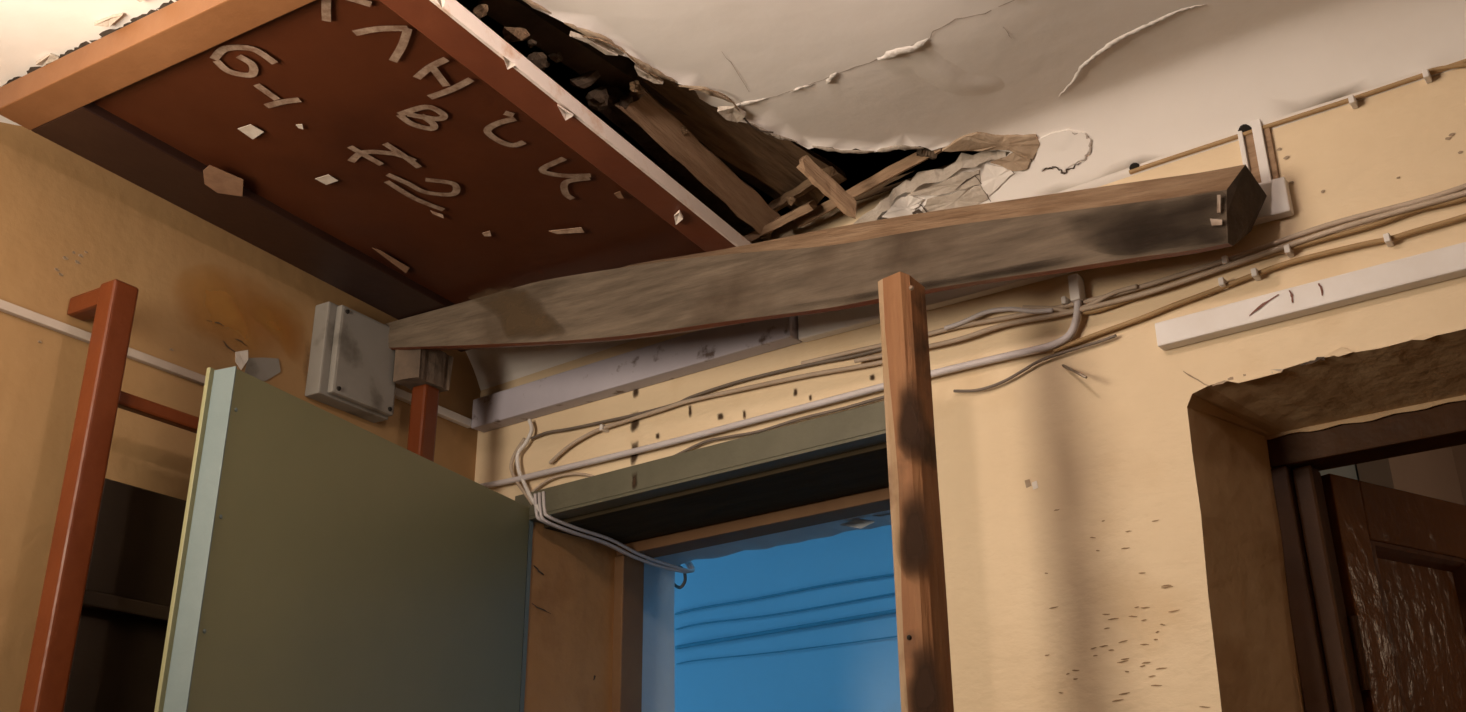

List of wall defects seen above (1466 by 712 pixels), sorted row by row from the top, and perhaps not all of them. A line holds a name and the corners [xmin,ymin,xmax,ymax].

peeling [569,31,618,56]
peeling [503,53,517,70]
peeling [634,64,664,84]
peeling [557,104,574,121]
peeling [717,105,746,122]
spalling [882,129,1092,218]